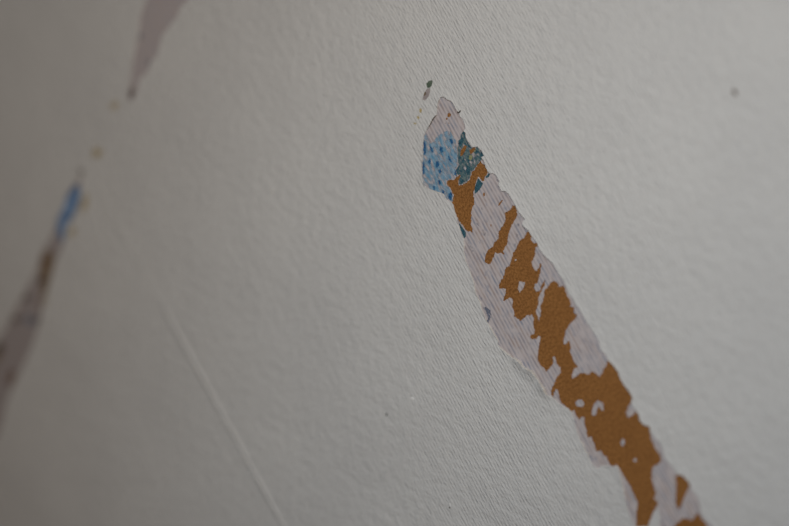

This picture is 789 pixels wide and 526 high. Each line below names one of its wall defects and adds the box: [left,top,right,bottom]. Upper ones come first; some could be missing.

peeling [575,399,604,416]